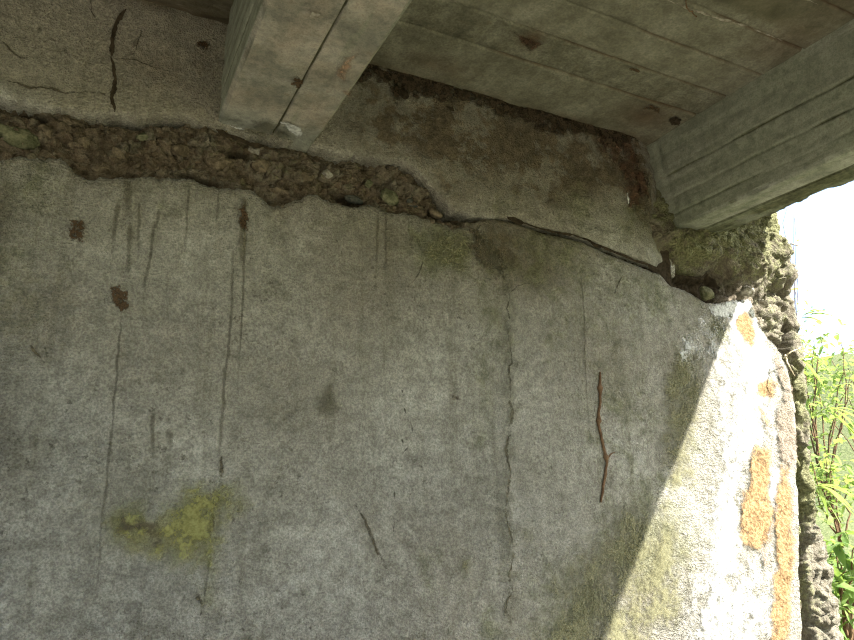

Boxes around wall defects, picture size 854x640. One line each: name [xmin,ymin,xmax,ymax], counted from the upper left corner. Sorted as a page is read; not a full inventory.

crack [9,0,160,112]
rust [68,220,85,242]
rust [110,285,129,312]
damp [220,200,247,435]
spalling [0,109,508,281]
crack [507,216,672,293]
crack [488,258,529,623]
damp [704,301,796,640]